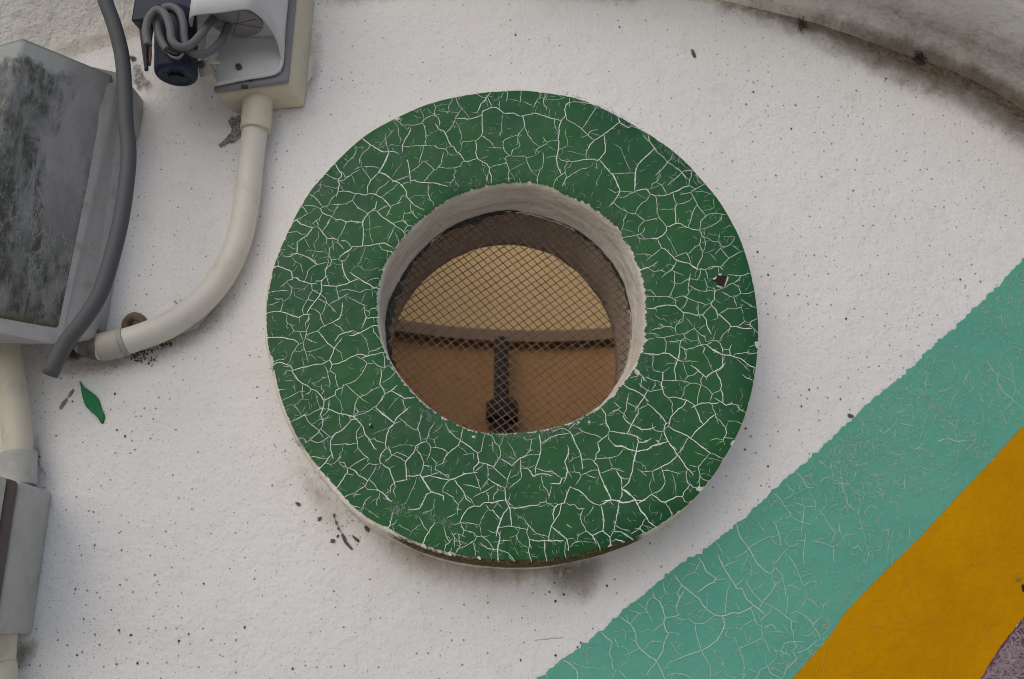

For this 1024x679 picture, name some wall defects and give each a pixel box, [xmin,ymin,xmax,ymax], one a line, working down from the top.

damp [756,8,1024,132]
crack [265,91,759,562]
crack [534,268,1024,679]